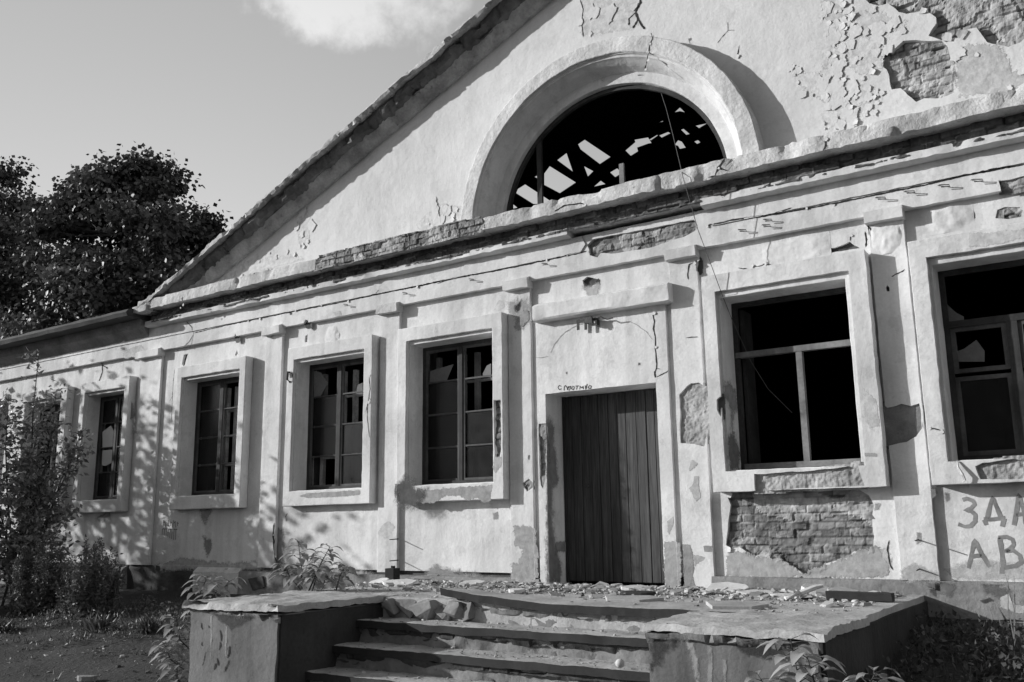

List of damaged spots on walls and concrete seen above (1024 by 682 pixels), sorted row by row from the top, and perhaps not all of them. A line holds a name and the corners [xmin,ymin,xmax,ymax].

spalling [787,0,1024,130]
spalling [151,112,1024,322]
crack [629,311,669,377]
peeling [418,400,501,504]
spalling [680,383,726,446]
spalling [863,388,926,449]
peeling [509,525,540,583]
spalling [725,461,893,579]